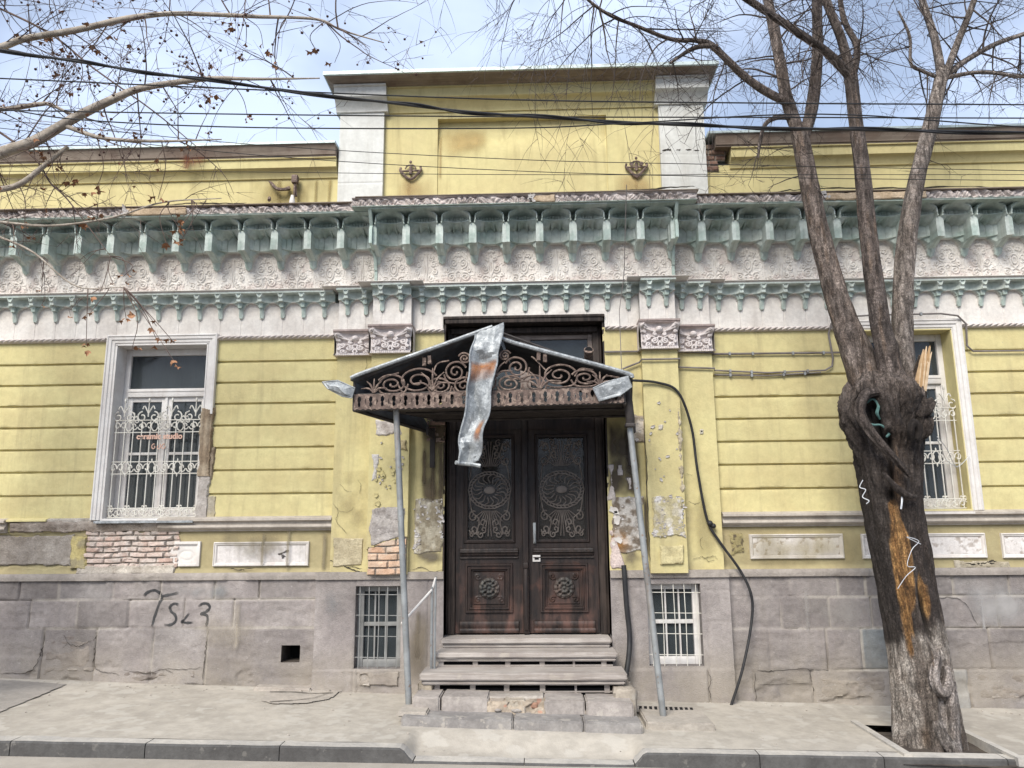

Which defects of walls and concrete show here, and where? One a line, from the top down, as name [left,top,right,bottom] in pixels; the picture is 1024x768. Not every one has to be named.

flaking render [0,518,181,574]
peeling [367,418,445,575]
spalling [607,401,687,554]
crack [3,634,208,679]